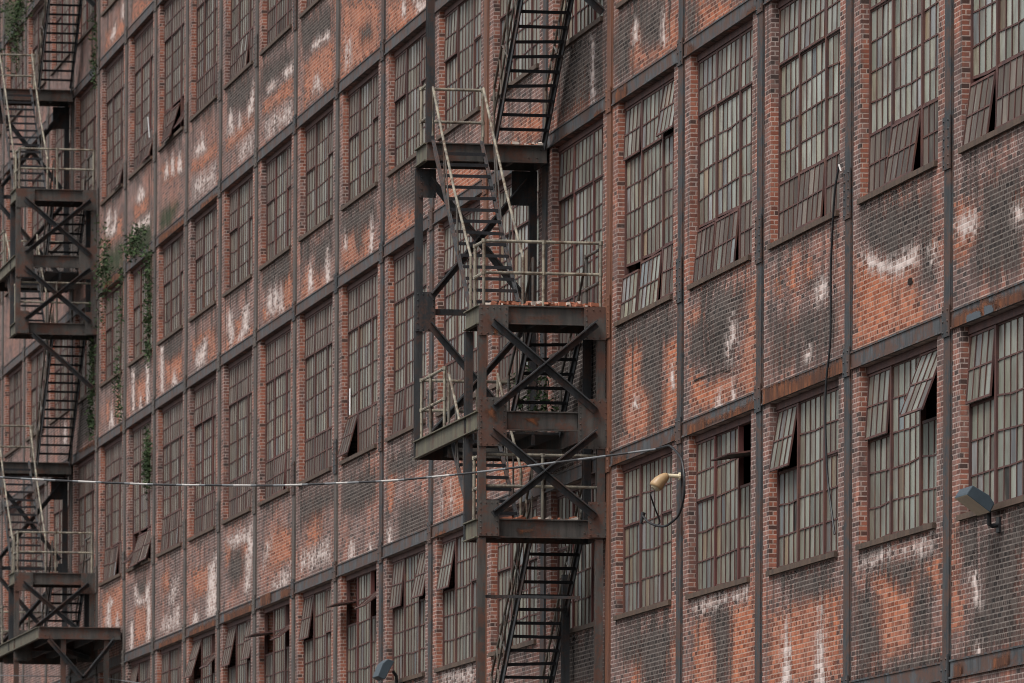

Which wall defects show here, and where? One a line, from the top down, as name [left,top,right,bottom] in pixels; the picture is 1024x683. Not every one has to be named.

leakage [263,38,292,92]
leakage [164,101,217,180]
leakage [226,70,291,161]
efflorescence [103,190,121,238]
leakage [132,166,150,234]
efflorescence [195,163,216,198]
efflorescence [957,209,977,238]
efflorescence [862,236,935,283]
leakage [100,494,287,650]
leakage [781,572,792,683]
leakage [810,563,832,683]